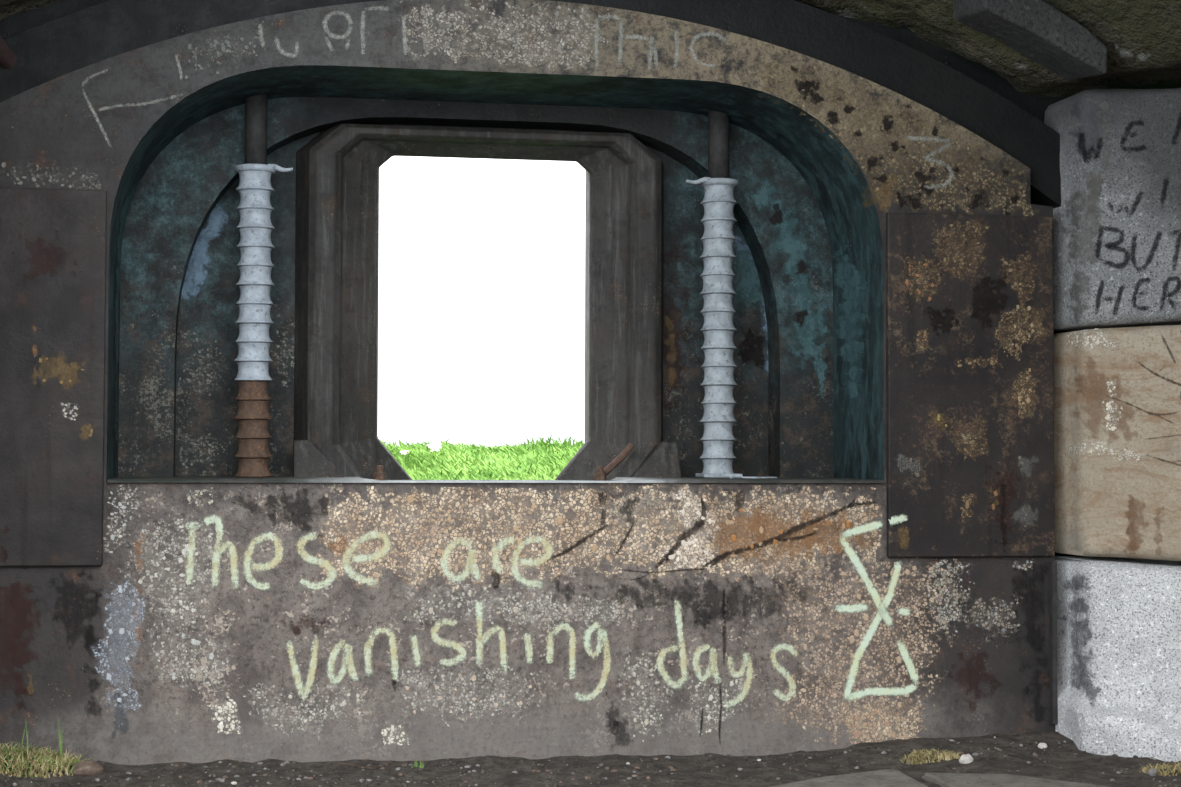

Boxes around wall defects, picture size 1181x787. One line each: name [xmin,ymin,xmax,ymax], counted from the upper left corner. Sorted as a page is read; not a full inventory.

crack [1109,331,1181,466]
crack [545,499,874,580]
rust [710,507,862,562]
damp [1062,576,1100,704]